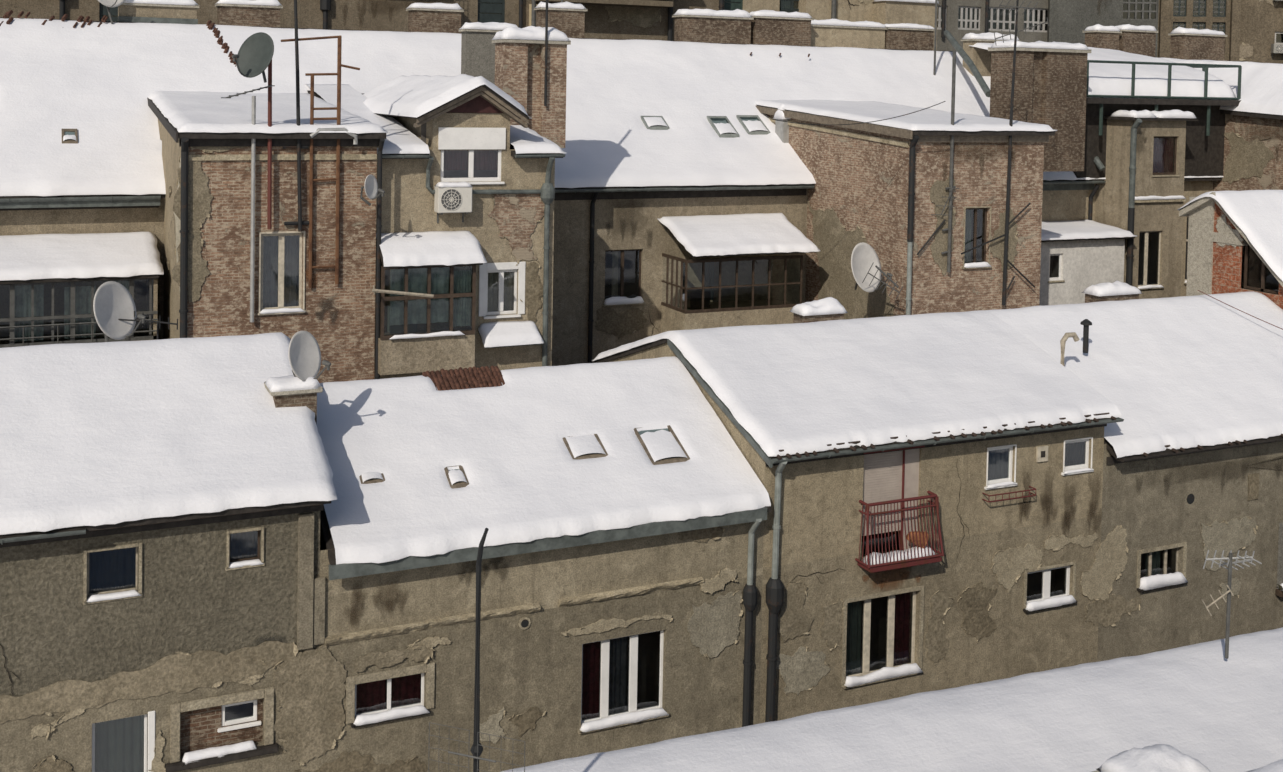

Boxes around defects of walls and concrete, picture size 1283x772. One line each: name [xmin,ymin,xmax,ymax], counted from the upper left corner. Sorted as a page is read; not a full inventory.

spalling [166,147,212,298]
flaking render [488,194,545,323]
spalling [561,578,743,660]
spalling [957,525,1129,643]
spalling [1201,516,1258,602]
crack [0,644,17,696]
spalling [0,641,298,740]
flaking render [148,731,166,772]